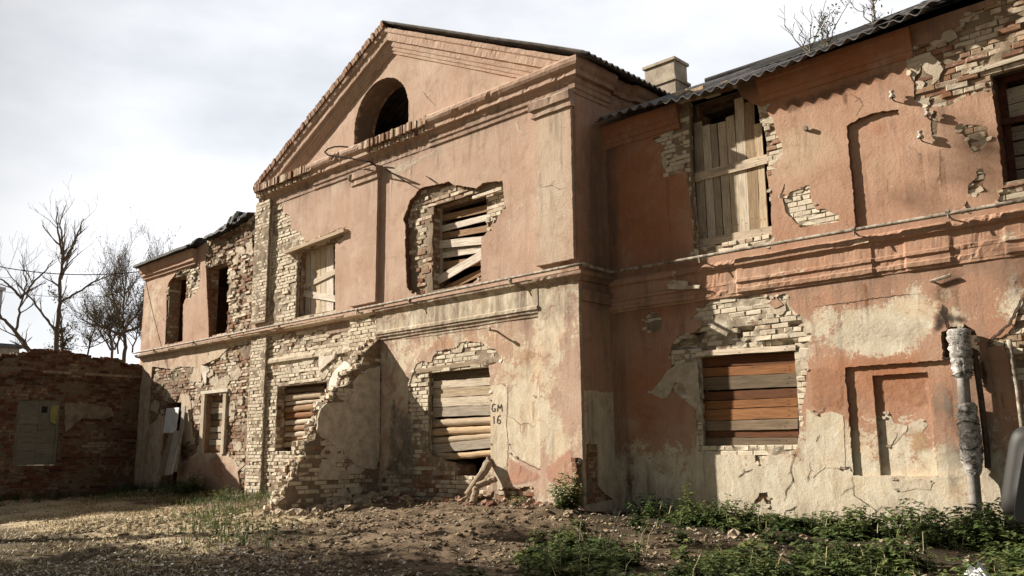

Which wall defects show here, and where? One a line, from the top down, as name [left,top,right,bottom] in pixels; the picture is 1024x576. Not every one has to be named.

flaking render [404,182,505,295]
flaking render [654,80,775,260]
flaking render [757,103,839,228]
flaking render [906,0,1024,141]
flaking render [954,123,992,152]
flaking render [149,213,256,492]
flaking render [254,164,375,515]
flaking render [378,341,541,500]
crack [506,399,541,480]
flaking render [642,294,845,478]
crack [784,455,810,515]